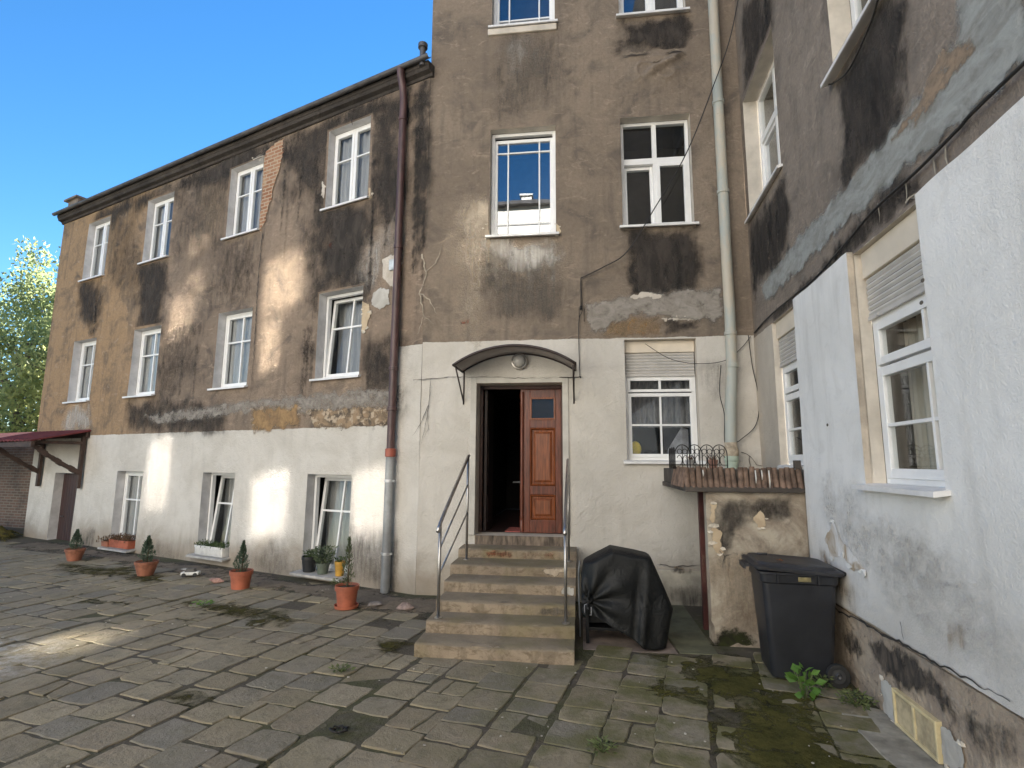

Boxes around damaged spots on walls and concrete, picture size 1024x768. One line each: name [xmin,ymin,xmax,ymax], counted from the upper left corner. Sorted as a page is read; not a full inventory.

flaking render [252,139,284,232]
crack [418,249,441,333]
damp [459,199,560,319]
flaking render [250,404,388,432]
flaking render [707,502,726,556]
flaking render [753,511,768,530]
peeling [825,519,866,578]
damp [844,634,1009,752]